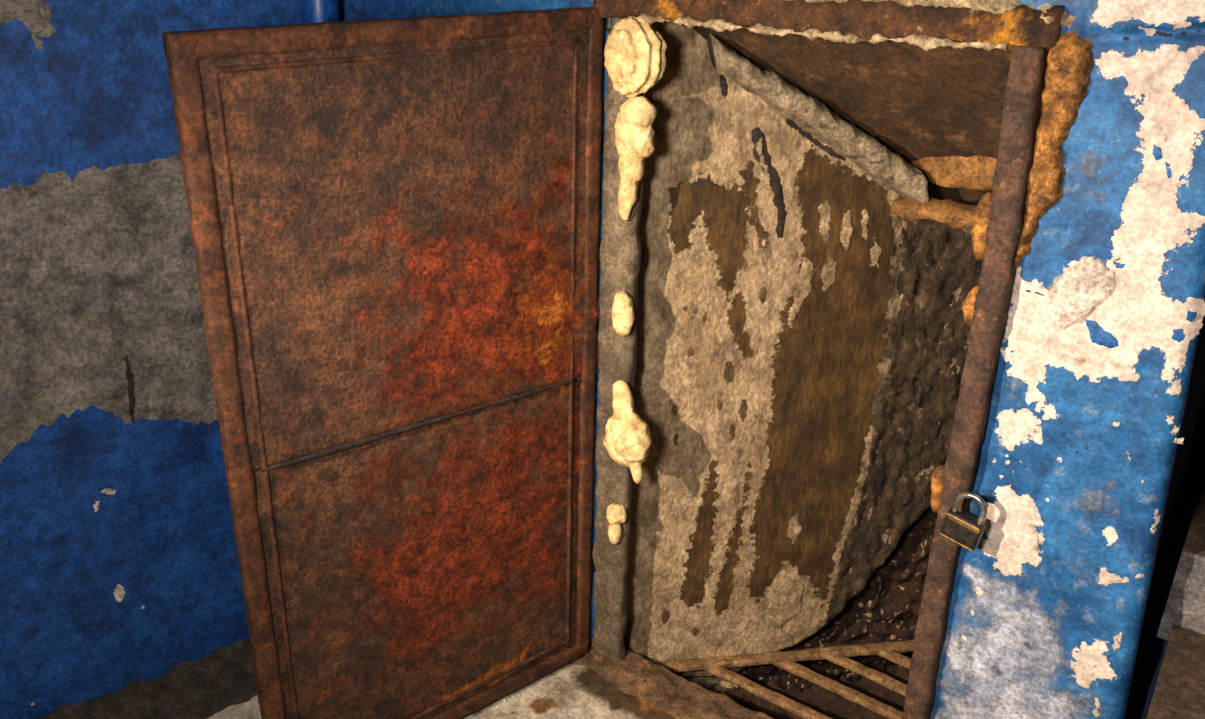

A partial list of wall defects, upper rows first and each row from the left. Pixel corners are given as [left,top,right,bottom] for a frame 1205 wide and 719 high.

corrosion [384,163,599,410]
leakage [666,144,896,628]
peeling [934,0,1205,719]
corrosion [441,646,530,700]
corrosion [530,699,553,713]